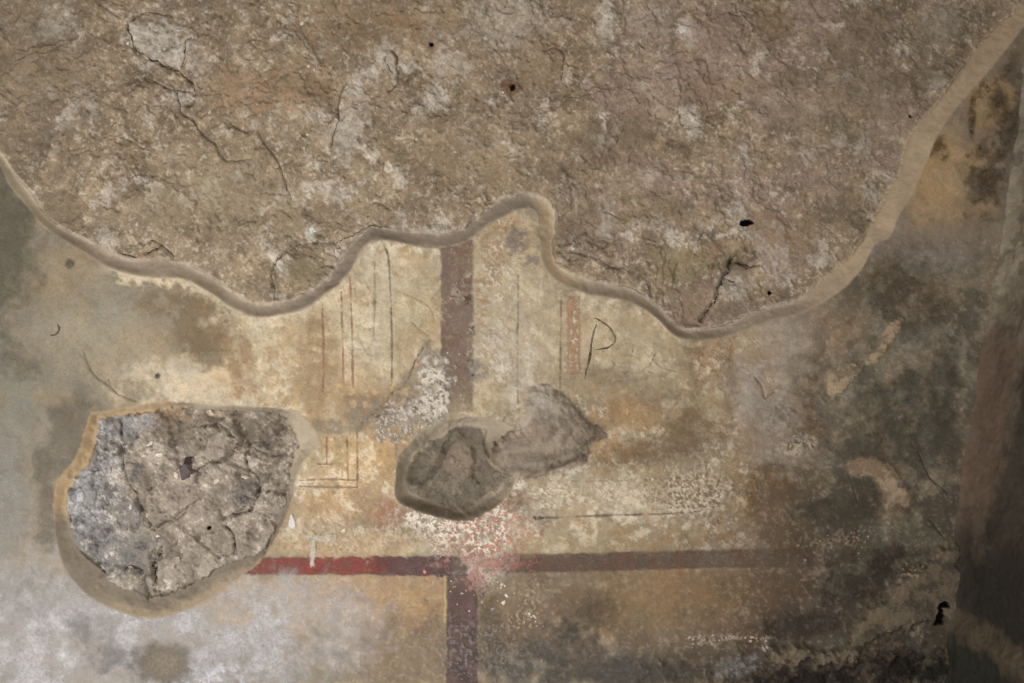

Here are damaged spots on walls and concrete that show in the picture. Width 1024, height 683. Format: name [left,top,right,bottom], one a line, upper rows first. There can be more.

crack [127,12,292,197]
crack [120,240,174,258]
crack [702,255,756,318]
spalling [53,345,733,629]